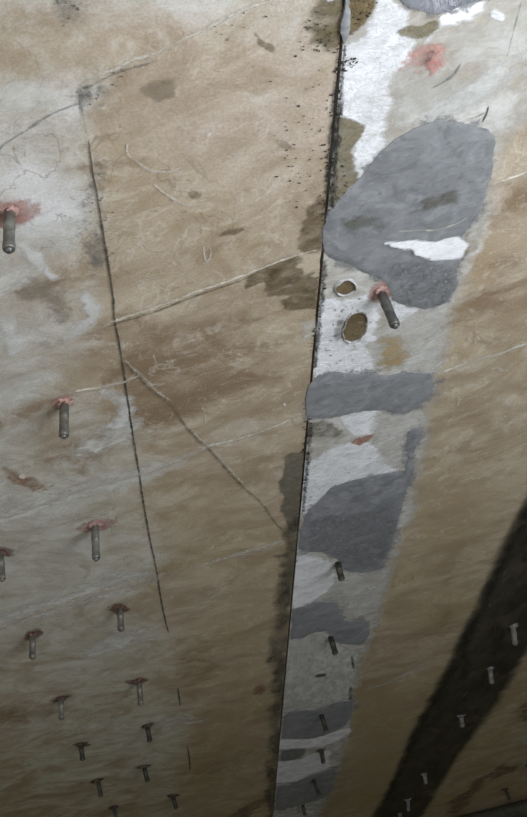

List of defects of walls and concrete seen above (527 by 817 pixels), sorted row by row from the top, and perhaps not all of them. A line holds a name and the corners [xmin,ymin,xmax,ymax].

crack [29,85,93,129]
damp [246,0,378,368]
crack [88,142,289,630]
damp [233,638,288,817]
damp [277,418,312,630]
damp [374,505,527,817]